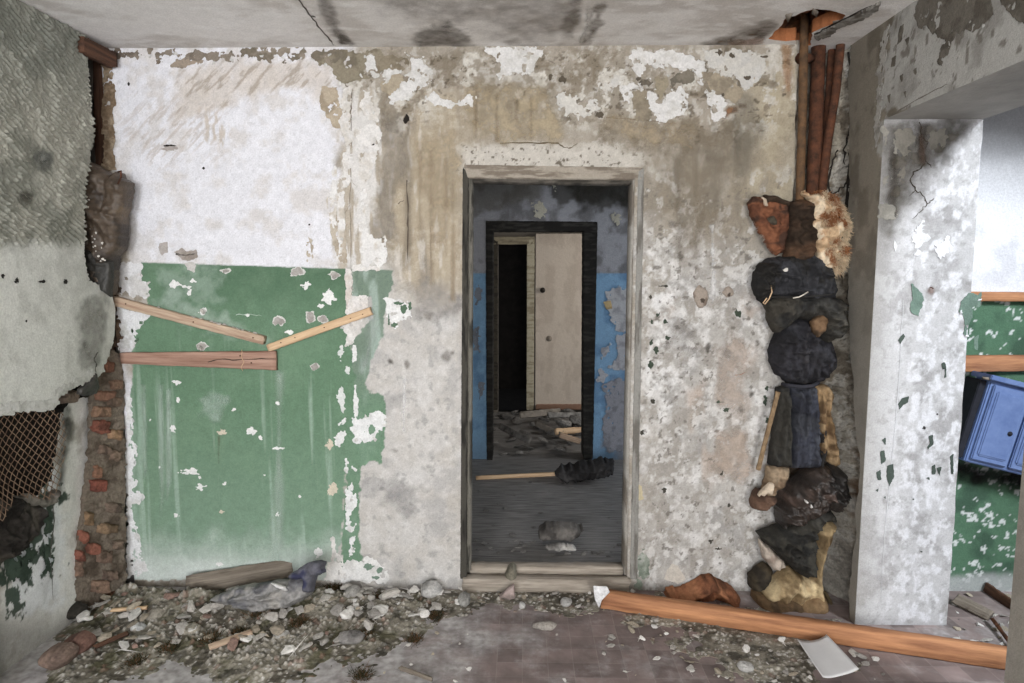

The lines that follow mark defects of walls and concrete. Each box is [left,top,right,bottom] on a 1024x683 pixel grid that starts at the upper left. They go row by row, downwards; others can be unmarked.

crack [299,0,332,42]
leakage [567,0,605,42]
spalling [779,1,881,41]
peeling [484,46,547,80]
peeling [549,45,768,124]
crack [890,84,947,218]
crack [827,126,850,299]
peeling [101,47,477,584]
flaking render [0,262,151,611]